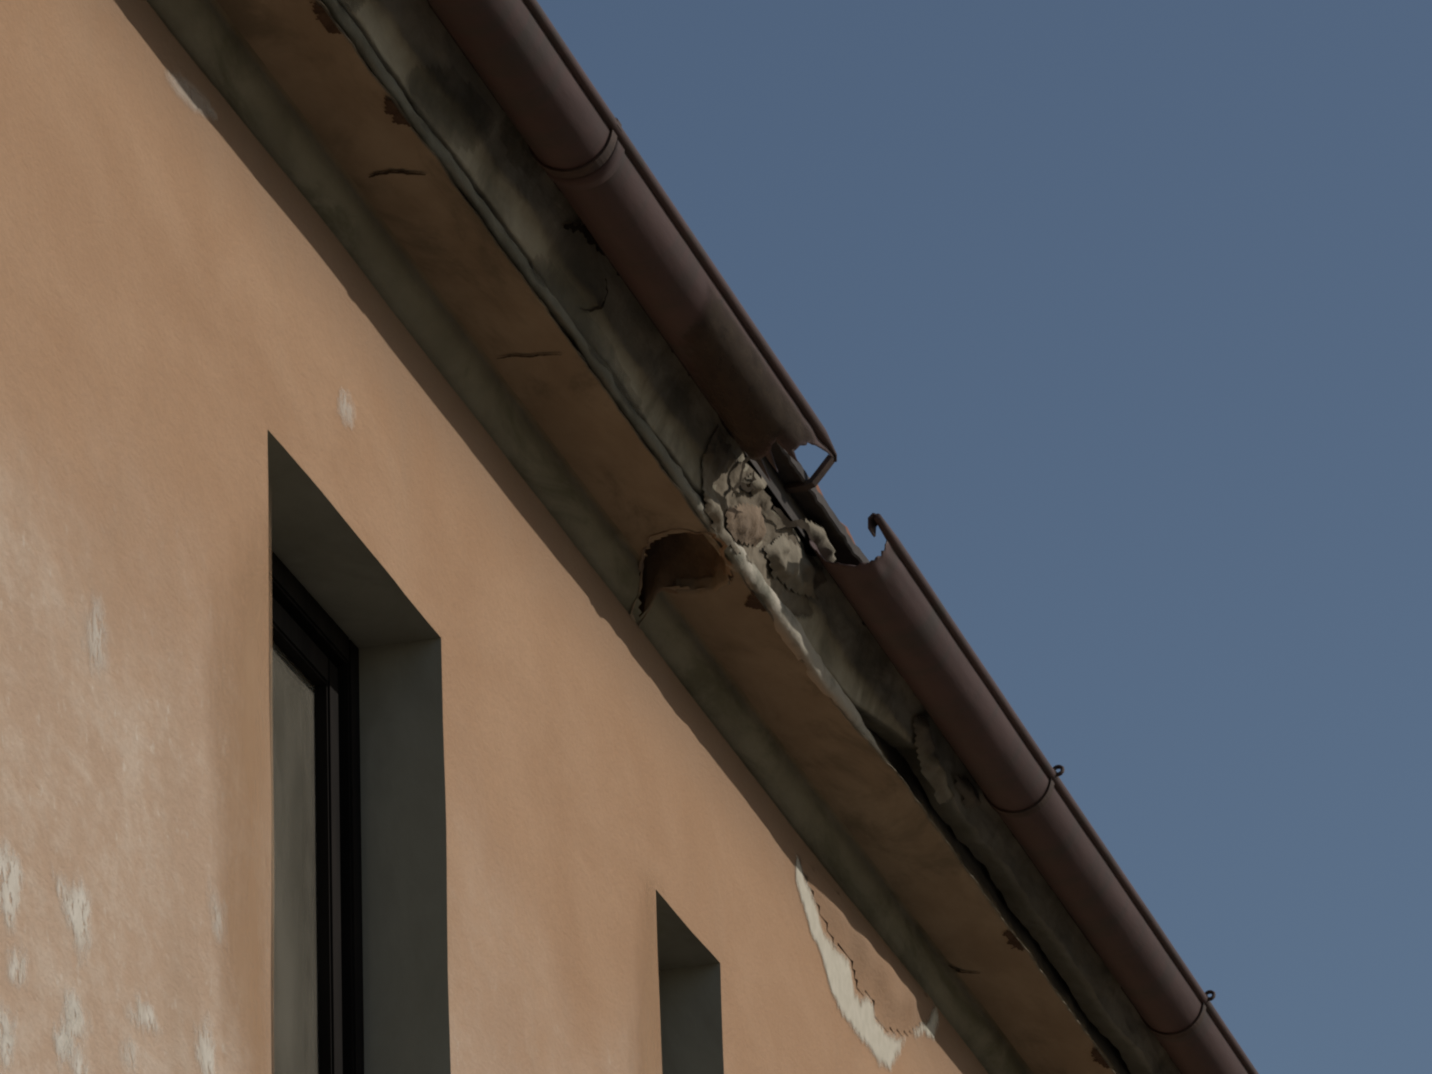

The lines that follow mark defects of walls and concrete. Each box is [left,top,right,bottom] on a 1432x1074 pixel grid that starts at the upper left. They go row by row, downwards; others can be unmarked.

spalling [630,425,836,629]
peeling [0,847,21,925]
peeling [58,883,89,947]
peeling [796,856,938,1070]
peeling [56,995,88,1074]
peeling [197,1034,214,1074]